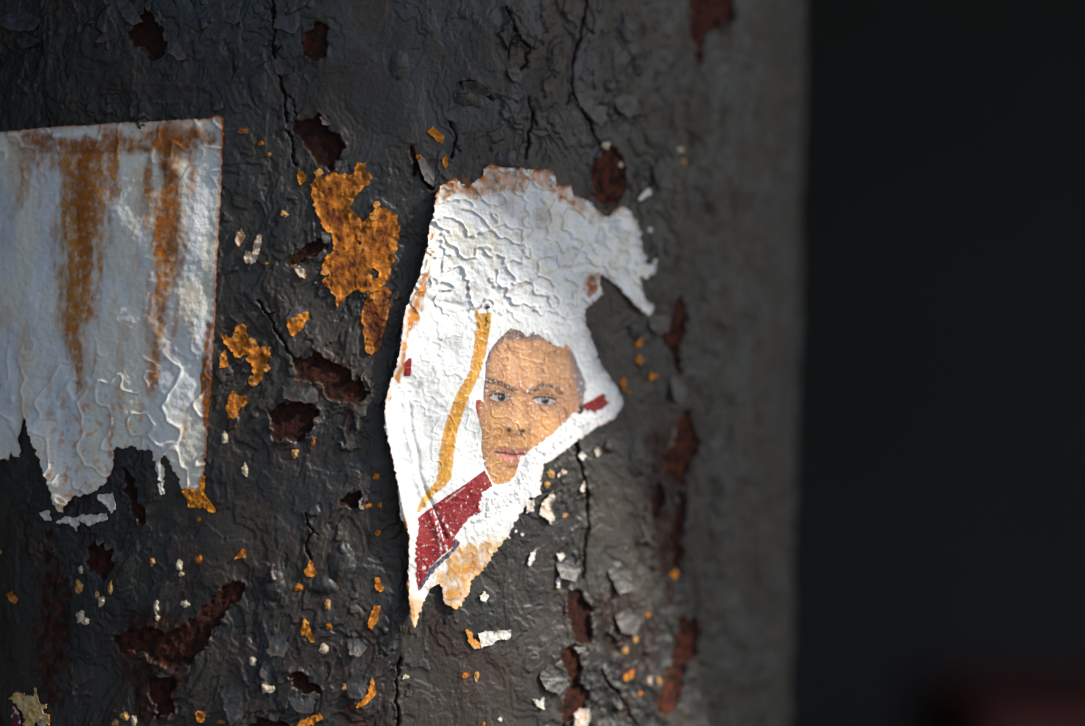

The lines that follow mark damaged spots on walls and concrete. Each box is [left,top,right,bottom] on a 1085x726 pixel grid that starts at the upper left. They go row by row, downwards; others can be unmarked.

corrosion [689,0,735,73]
crack [270,0,298,166]
crack [566,0,603,150]
crack [524,97,537,159]
crack [410,146,434,191]
corrosion [287,231,333,265]
peeling [282,384,318,403]
peeling [249,633,290,666]
peeling [347,638,367,657]
peeling [221,687,243,725]
peeling [288,667,328,713]
crack [393,657,402,726]